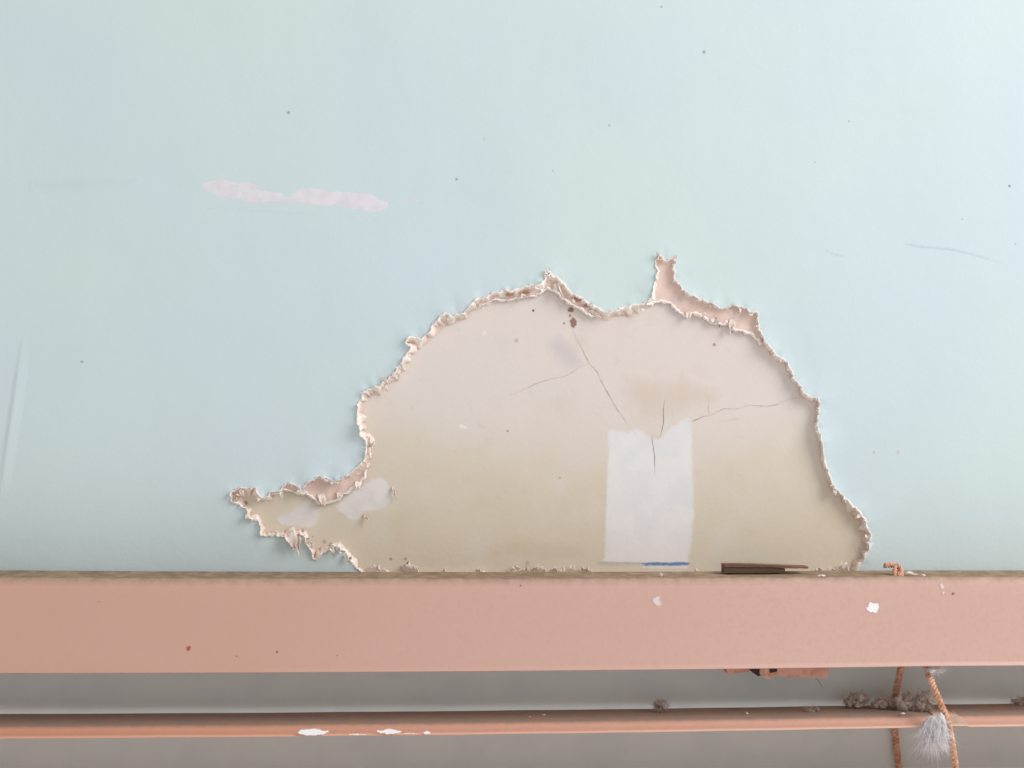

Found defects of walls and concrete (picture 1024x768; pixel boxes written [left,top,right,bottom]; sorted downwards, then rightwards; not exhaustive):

crack [652,394,793,472]
peeling [271,527,314,555]